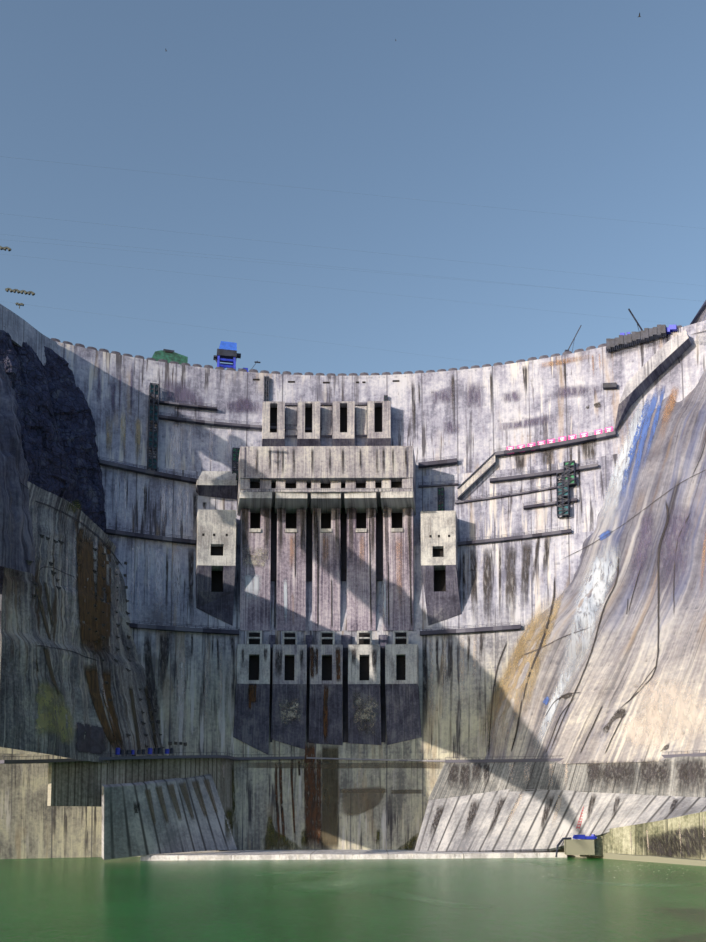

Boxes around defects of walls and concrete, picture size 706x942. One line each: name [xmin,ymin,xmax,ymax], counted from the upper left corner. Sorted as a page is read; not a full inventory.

damp [412,384,420,427]
damp [506,368,527,400]
damp [507,418,548,428]
damp [559,363,585,396]
damp [462,538,549,603]
damp [572,554,616,648]
damp [129,635,169,750]
corrosion [310,647,318,677]
corrosion [323,649,340,740]
damp [542,674,570,729]
damp [134,768,236,832]
corrosion [304,745,322,845]